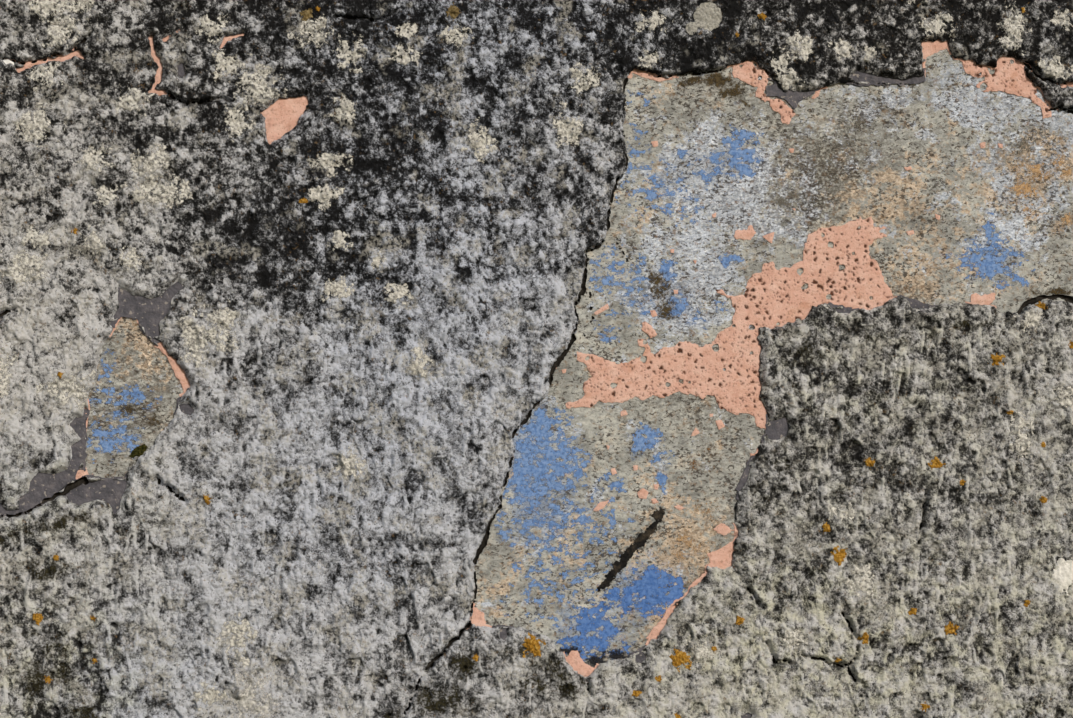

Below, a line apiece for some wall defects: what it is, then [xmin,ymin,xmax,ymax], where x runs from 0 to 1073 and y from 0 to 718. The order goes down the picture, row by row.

peeling [3,46,86,73]
peeling [260,95,309,144]
spalling [0,281,194,518]
crack [404,69,721,714]
spalling [463,39,1073,683]
crack [1016,294,1073,315]